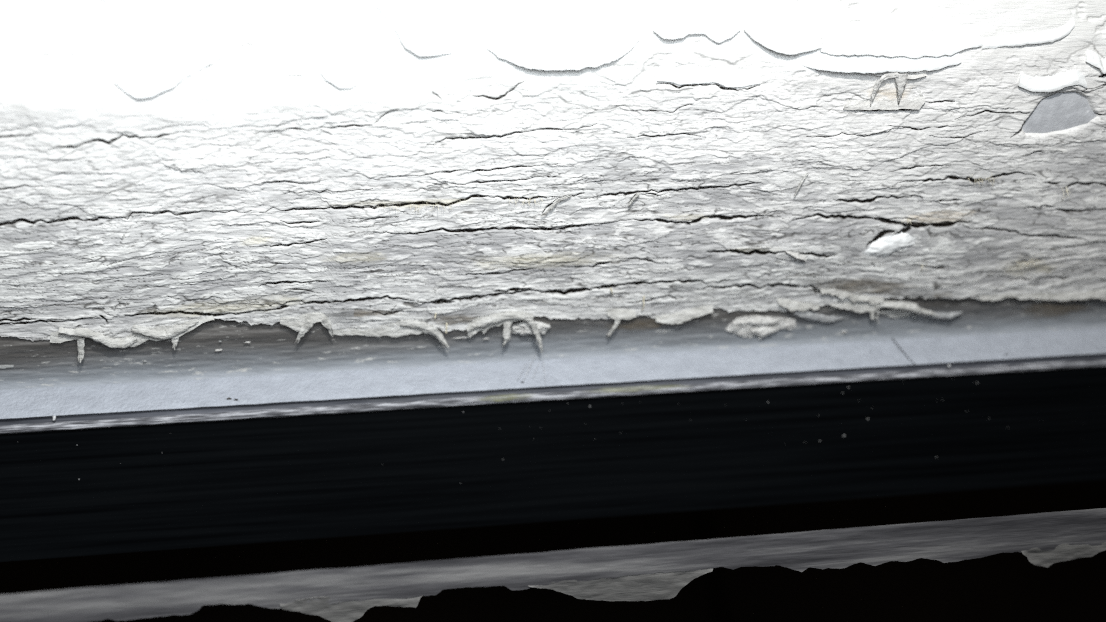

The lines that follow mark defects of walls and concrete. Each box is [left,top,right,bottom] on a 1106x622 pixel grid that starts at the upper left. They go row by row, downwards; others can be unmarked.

peeling [799,17,1075,110]
crack [427,80,760,145]
spalling [1018,49,1106,133]
crack [0,100,1106,280]
peeling [50,315,215,363]
peeling [280,312,450,349]
crack [0,258,821,325]
peeling [466,311,551,354]
peeling [606,308,636,338]
peeling [655,304,713,324]
peeling [725,288,938,340]
peeling [979,290,1106,301]